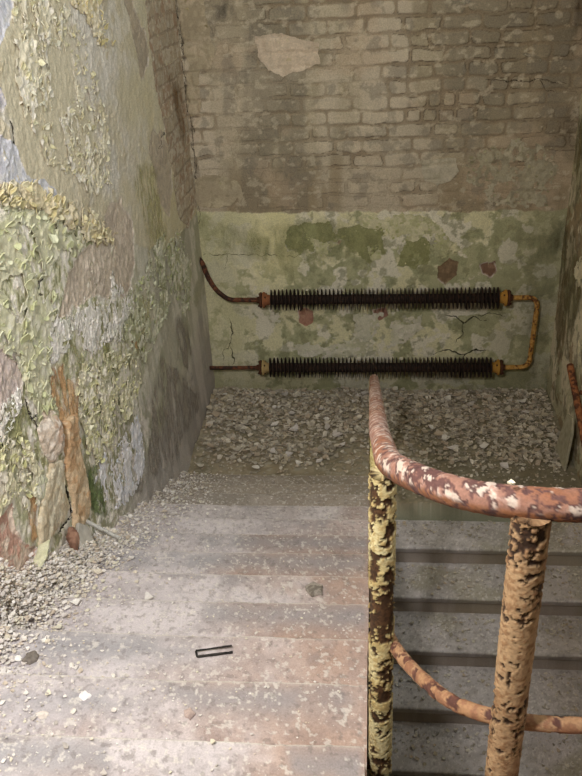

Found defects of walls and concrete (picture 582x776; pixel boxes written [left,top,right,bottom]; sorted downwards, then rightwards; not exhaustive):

flaking render [255,33,320,77]
crack [175,0,197,179]
flaking render [479,261,497,278]
peeling [574,256,582,288]
peeling [0,0,216,598]
crack [222,321,235,365]
crack [433,312,502,361]